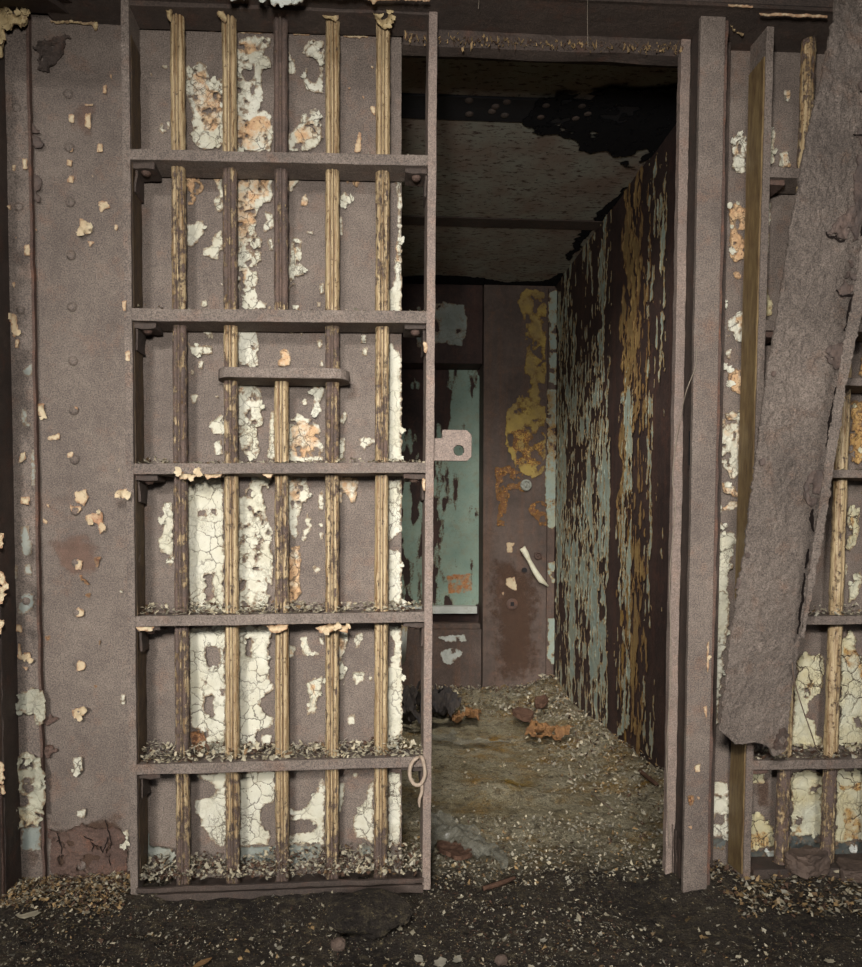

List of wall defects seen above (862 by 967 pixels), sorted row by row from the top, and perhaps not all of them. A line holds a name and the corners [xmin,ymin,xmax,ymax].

peeling [185,61,223,150]
peeling [237,31,273,152]
peeling [288,33,325,93]
peeling [727,201,745,279]
peeling [723,300,742,394]
rust [717,0,862,756]
peeling [0,87,693,967]
peeling [792,652,825,749]
peeling [839,629,862,751]
rust [47,823,128,880]